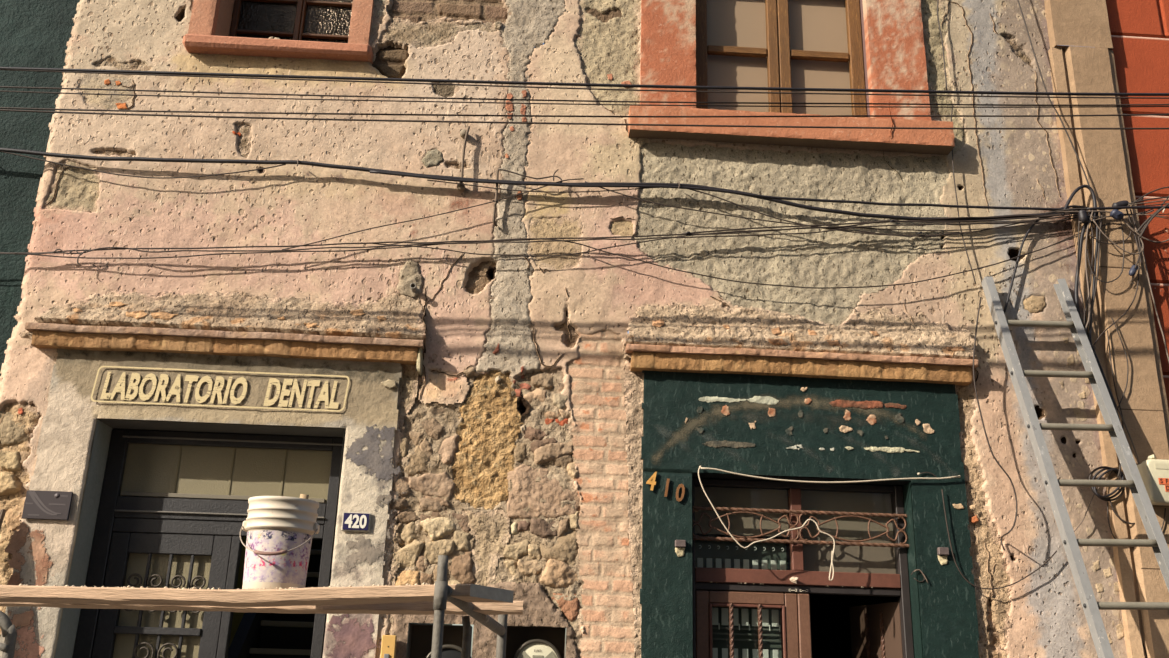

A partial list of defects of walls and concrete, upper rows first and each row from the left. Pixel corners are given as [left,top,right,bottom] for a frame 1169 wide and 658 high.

flaking render [388,0,508,29]
crack [941,0,1009,212]
crack [1035,71,1062,200]
spalling [465,261,496,294]
crack [418,254,472,402]
spalling [554,317,579,348]
peeling [785,387,812,435]
peeling [823,410,876,436]
spalling [895,413,935,434]
flaking render [0,402,55,586]
flaking render [344,365,585,658]
peeling [0,607,44,658]